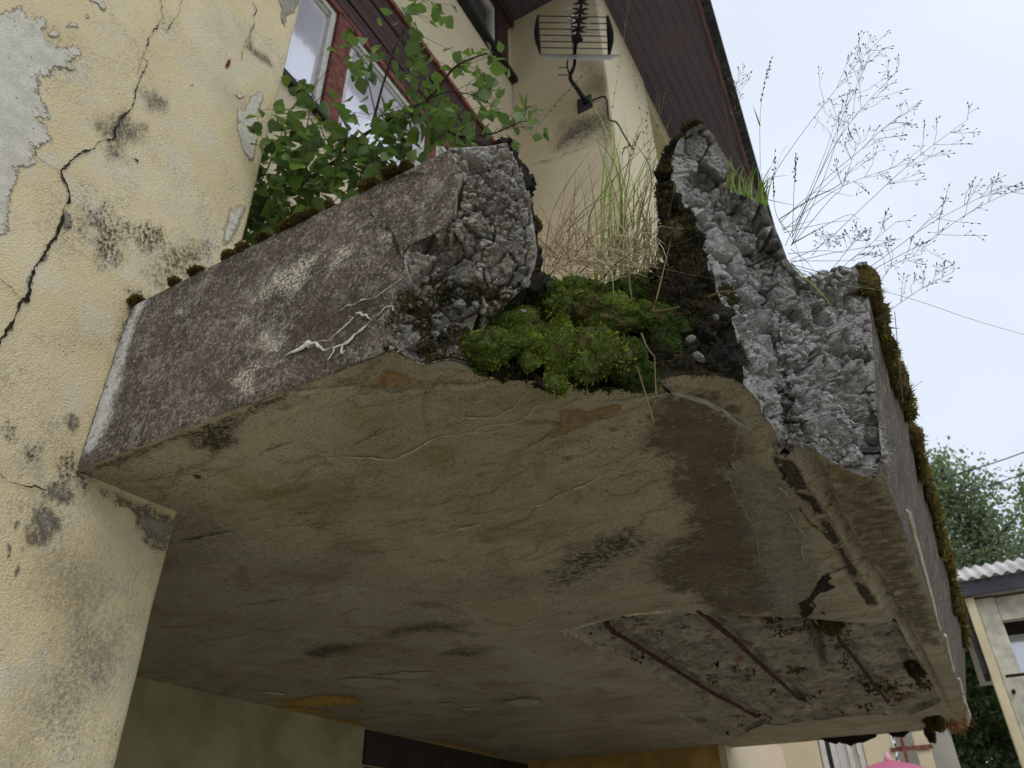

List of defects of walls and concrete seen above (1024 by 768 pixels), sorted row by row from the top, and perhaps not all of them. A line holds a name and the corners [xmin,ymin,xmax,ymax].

leakage [2,419,44,463]
peeling [0,0,107,235]
crack [0,0,183,345]
leakage [78,200,214,284]
leakage [57,245,402,489]
peeling [236,91,263,161]
spalling [384,143,537,372]
leakage [421,390,820,617]
spalling [671,124,898,479]
spalling [560,576,941,739]